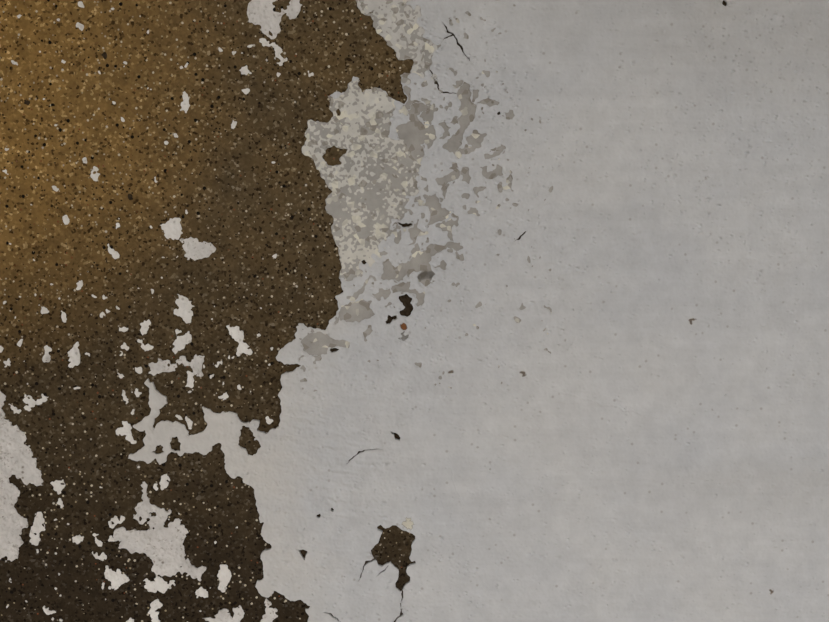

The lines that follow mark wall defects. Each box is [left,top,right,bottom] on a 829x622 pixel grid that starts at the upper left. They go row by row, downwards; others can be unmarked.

peeling [0,0,519,622]